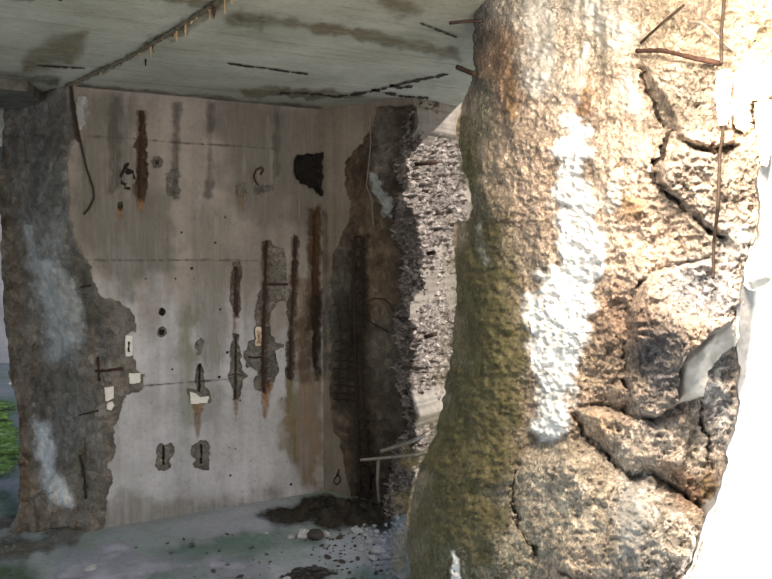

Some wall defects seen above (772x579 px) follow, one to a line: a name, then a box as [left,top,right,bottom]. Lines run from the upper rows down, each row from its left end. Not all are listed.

water stain [285,19,457,56]
spalling [0,86,149,533]
spalling [227,234,300,418]
rust [284,207,330,491]
hole [293,152,324,196]
spalling [328,0,772,579]
efflorescence [521,42,620,442]
crack [638,68,733,232]
spalling [155,443,175,471]
crack [572,416,630,477]
crack [699,404,711,466]